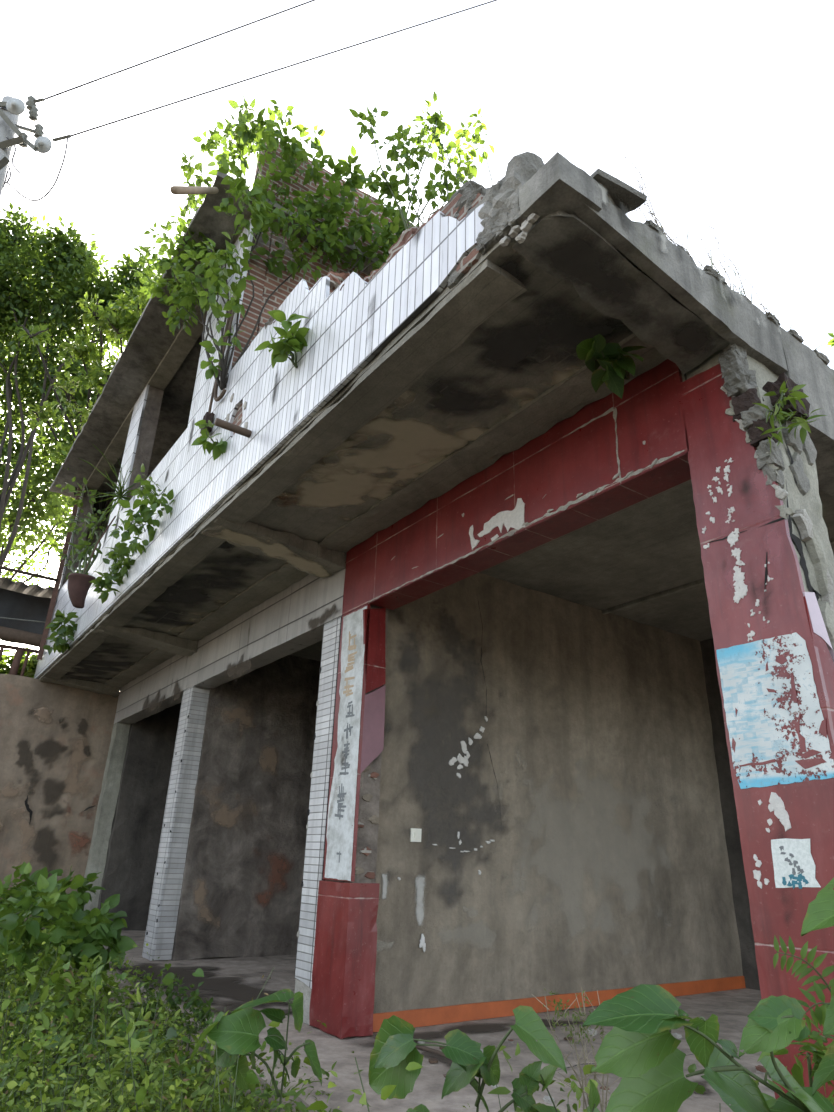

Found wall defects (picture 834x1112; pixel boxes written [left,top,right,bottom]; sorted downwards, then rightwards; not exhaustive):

spalling [444,152,647,289]
damp [475,237,647,385]
spalling [766,312,830,365]
damp [140,529,329,633]
damp [227,655,251,677]
damp [308,605,338,630]
damp [298,379,538,520]
peeling [370,407,684,602]
peeling [702,458,773,641]
spalling [718,344,817,520]
damp [16,739,67,873]
peeling [758,792,791,833]